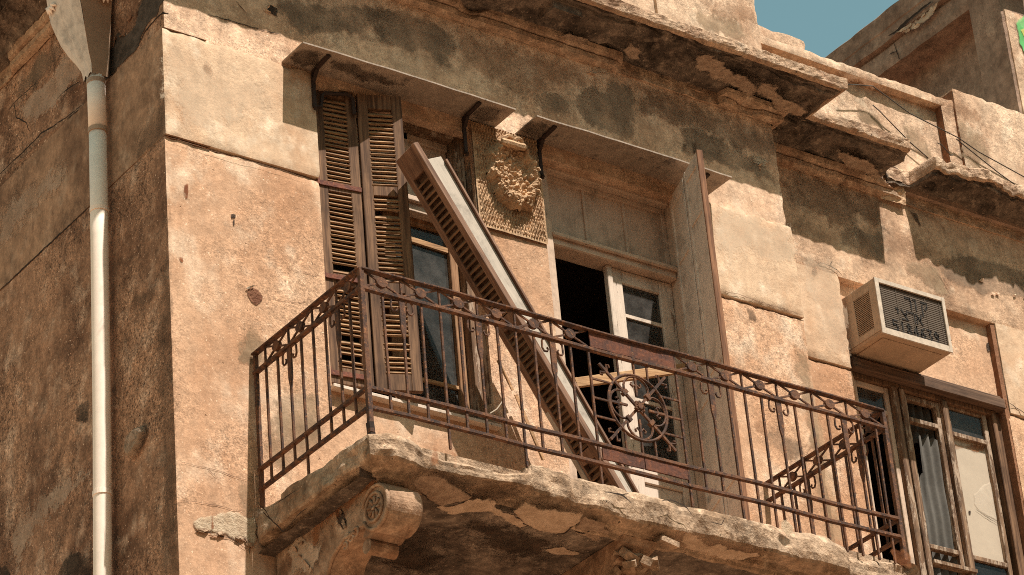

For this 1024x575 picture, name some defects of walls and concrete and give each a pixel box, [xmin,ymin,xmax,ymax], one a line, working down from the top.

damp [275,1,410,45]
damp [422,24,457,68]
damp [557,82,635,133]
flaking render [696,55,808,116]
damp [847,226,885,260]
flaking render [412,476,609,541]
flaking render [194,512,257,550]
flaking render [546,547,579,555]